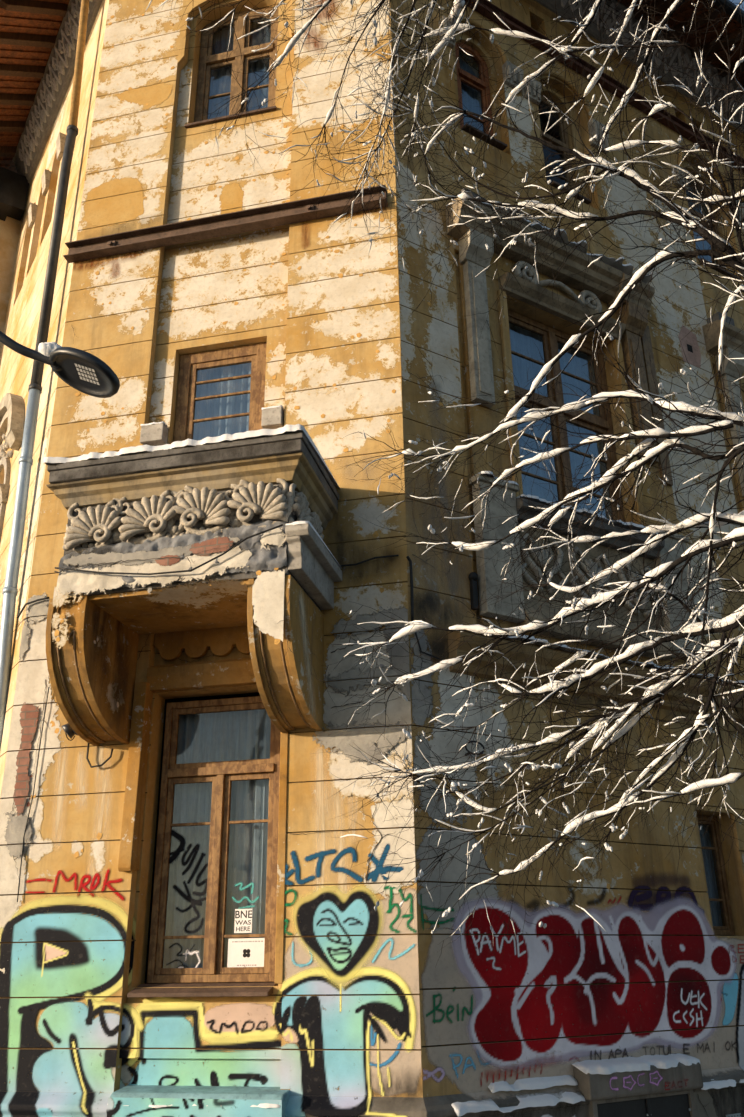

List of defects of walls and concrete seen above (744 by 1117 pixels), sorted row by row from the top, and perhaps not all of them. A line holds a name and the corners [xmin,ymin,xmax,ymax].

peeling [77,0,393,233]
peeling [66,157,462,464]
spalling [0,423,288,930]
spalling [312,577,515,932]